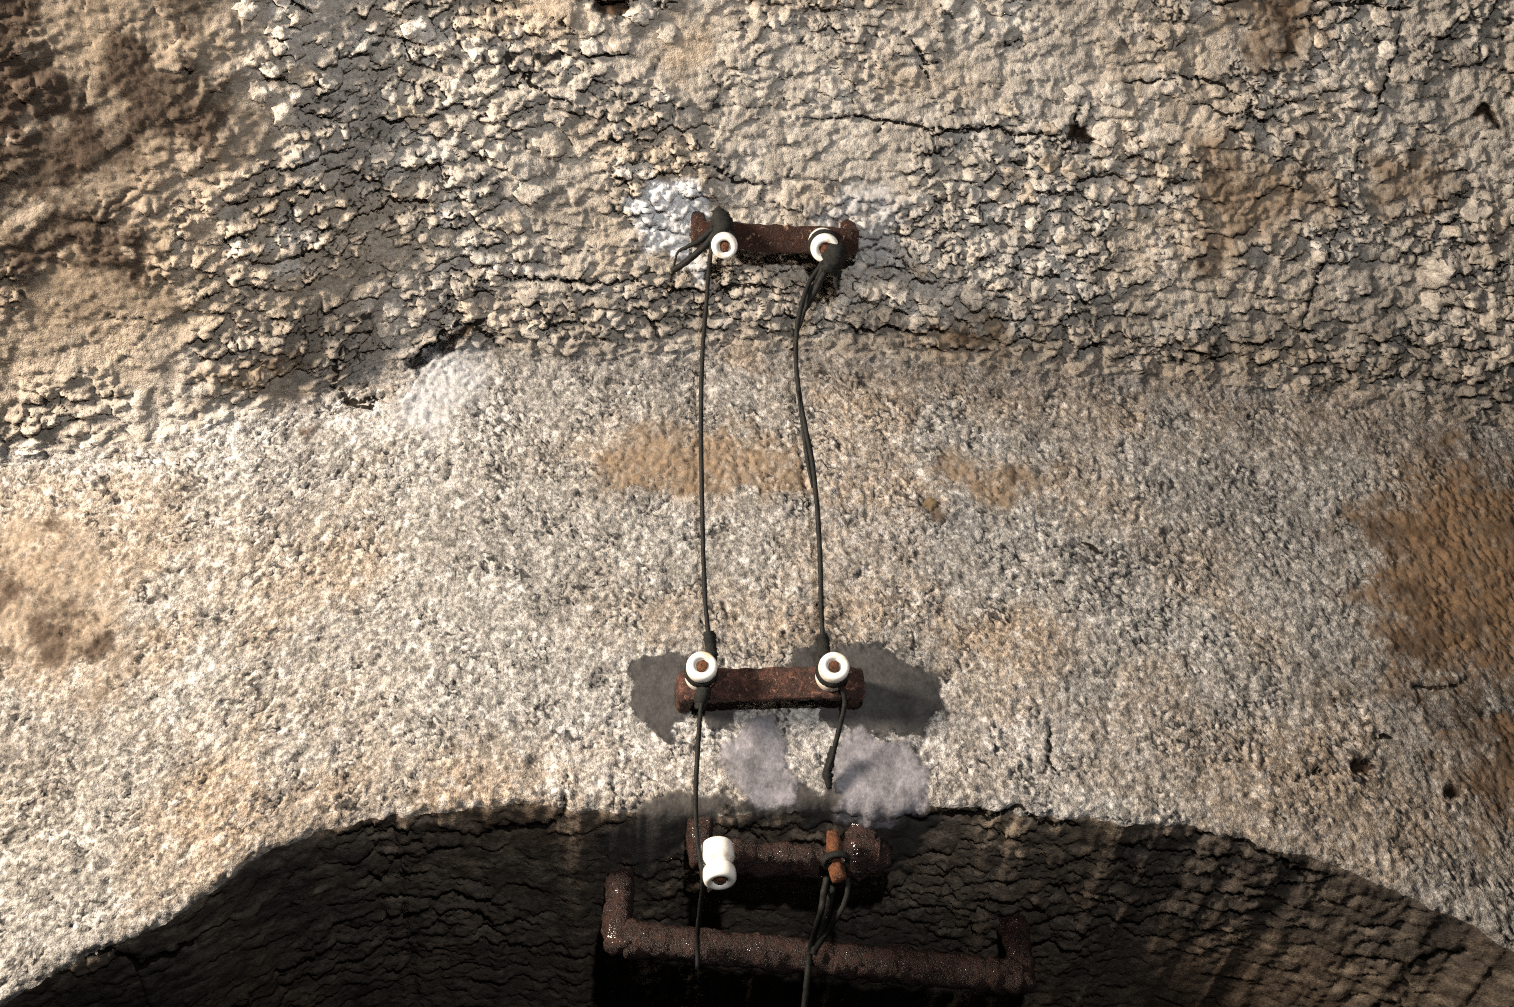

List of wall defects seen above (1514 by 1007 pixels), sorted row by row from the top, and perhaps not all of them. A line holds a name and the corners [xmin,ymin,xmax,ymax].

damp [0,0,231,290]
crack [276,0,322,89]
crack [473,68,573,118]
crack [910,39,939,82]
crack [806,104,1091,144]
crack [1124,72,1298,134]
crack [1295,0,1411,180]
crack [409,267,800,363]
crack [1302,220,1341,326]
crack [1479,225,1514,297]
crack [329,344,383,410]
damp [0,570,114,671]